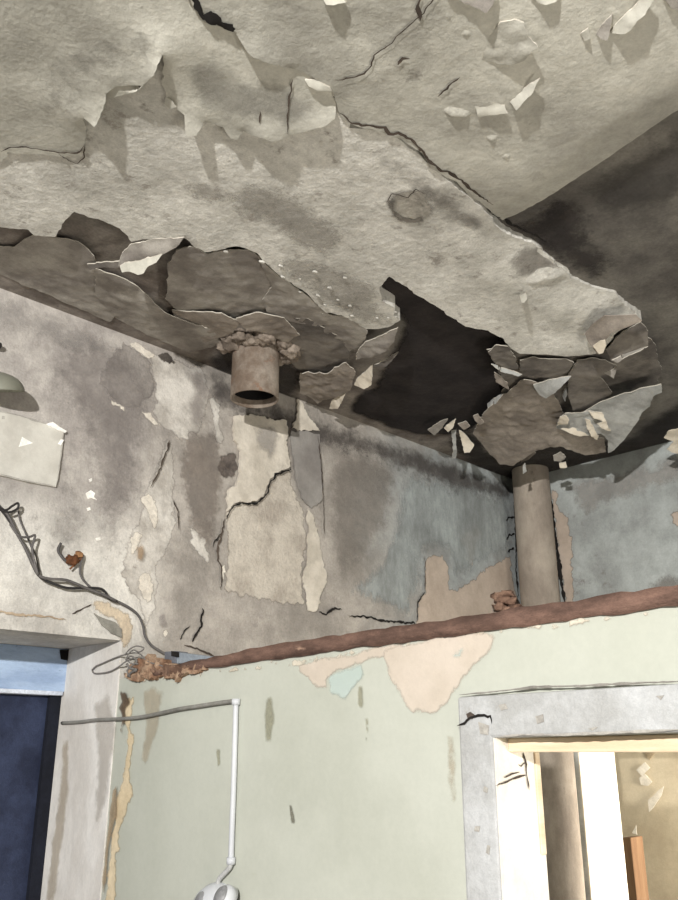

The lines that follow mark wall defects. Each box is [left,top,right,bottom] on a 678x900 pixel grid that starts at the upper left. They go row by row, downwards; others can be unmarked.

crack [336,0,433,81]
crack [340,113,543,240]
water stain [519,202,604,277]
peeling [0,0,678,626]
water stain [215,383,510,610]
crack [180,608,214,656]
peeling [292,629,502,713]
crack [457,681,678,788]
peeling [102,692,134,900]